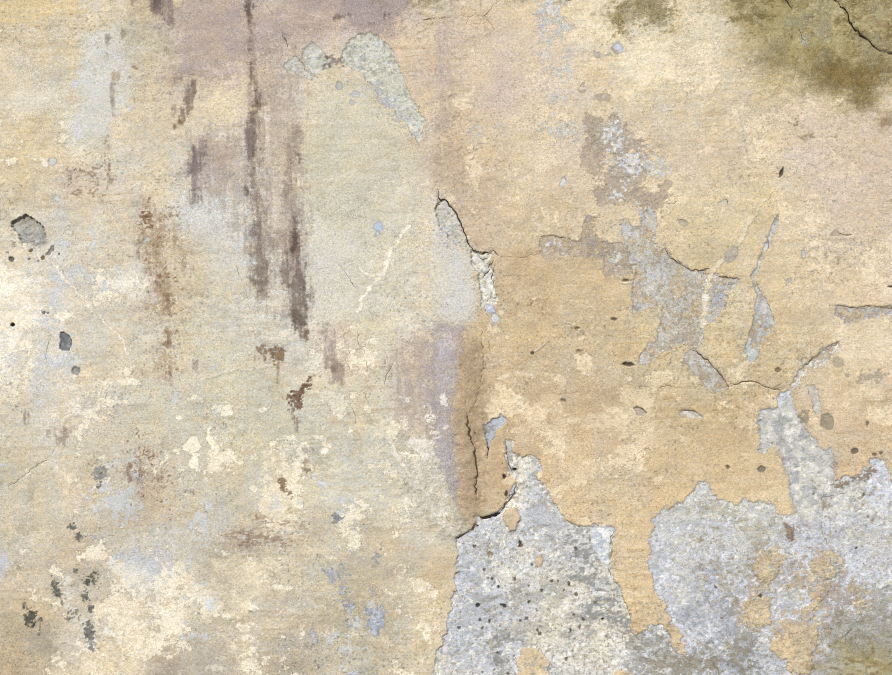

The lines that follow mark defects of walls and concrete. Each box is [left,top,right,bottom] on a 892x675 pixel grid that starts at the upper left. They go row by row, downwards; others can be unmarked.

crack [835,0,892,54]
peeling [284,32,425,145]
flaking render [6,214,60,262]
corrosion [135,211,160,247]
crack [436,191,536,276]
peeling [535,111,740,392]
peeling [744,214,779,362]
corrosion [255,344,285,369]
corrosion [282,376,312,412]
crack [337,224,516,541]
peeling [407,393,449,465]
spalling [433,341,892,675]